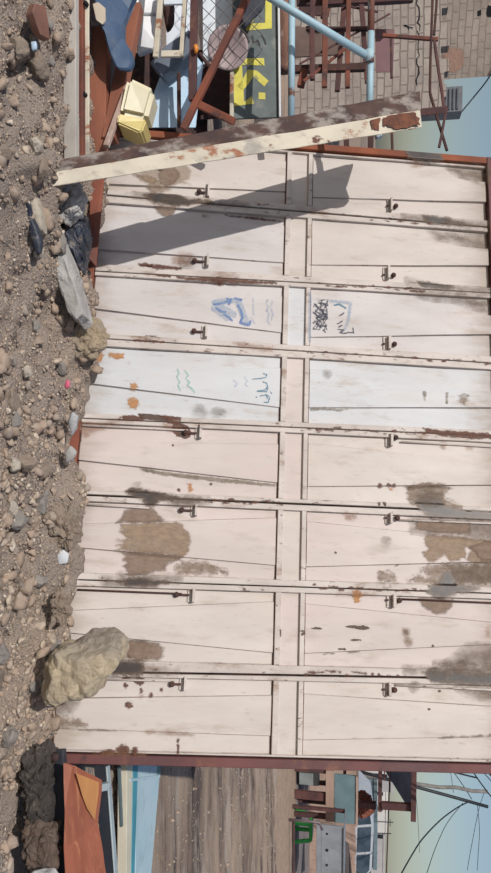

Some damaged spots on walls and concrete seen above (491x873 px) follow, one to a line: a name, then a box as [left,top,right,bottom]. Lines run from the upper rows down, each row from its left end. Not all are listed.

rust [57,91,421,171]
leakage [134,166,190,192]
rust [139,261,277,286]
rust [171,423,191,439]
leakage [116,508,226,576]
leakage [407,483,491,614]
leakage [127,640,162,661]
leakage [444,671,491,686]